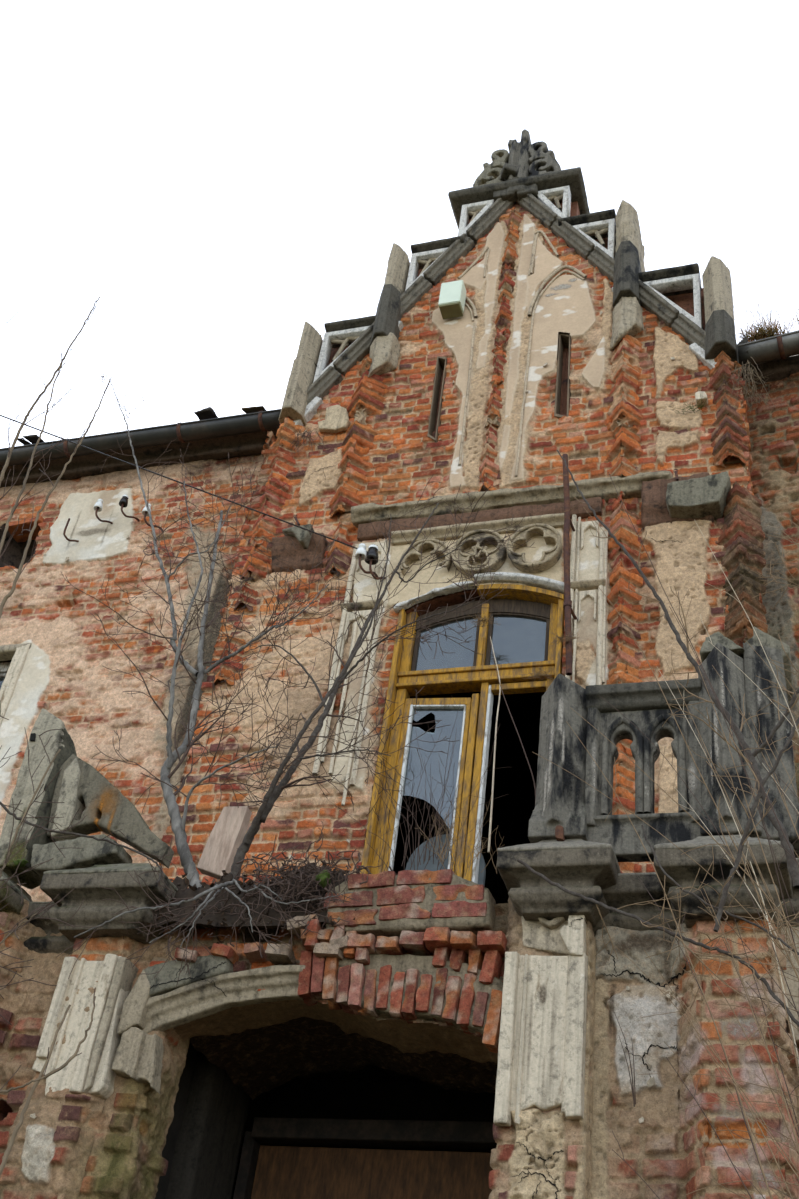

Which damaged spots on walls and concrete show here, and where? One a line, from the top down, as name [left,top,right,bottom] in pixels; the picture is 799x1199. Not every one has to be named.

spalling [524,236,606,486]
spalling [665,357,708,407]
spalling [52,598,79,609]
spalling [0,639,169,818]
damp [543,699,595,815]
damp [711,671,751,801]
damp [757,675,776,753]
damp [687,767,695,812]
crack [625,1043,678,1078]
spalling [0,1100,14,1121]
crack [514,1142,564,1199]